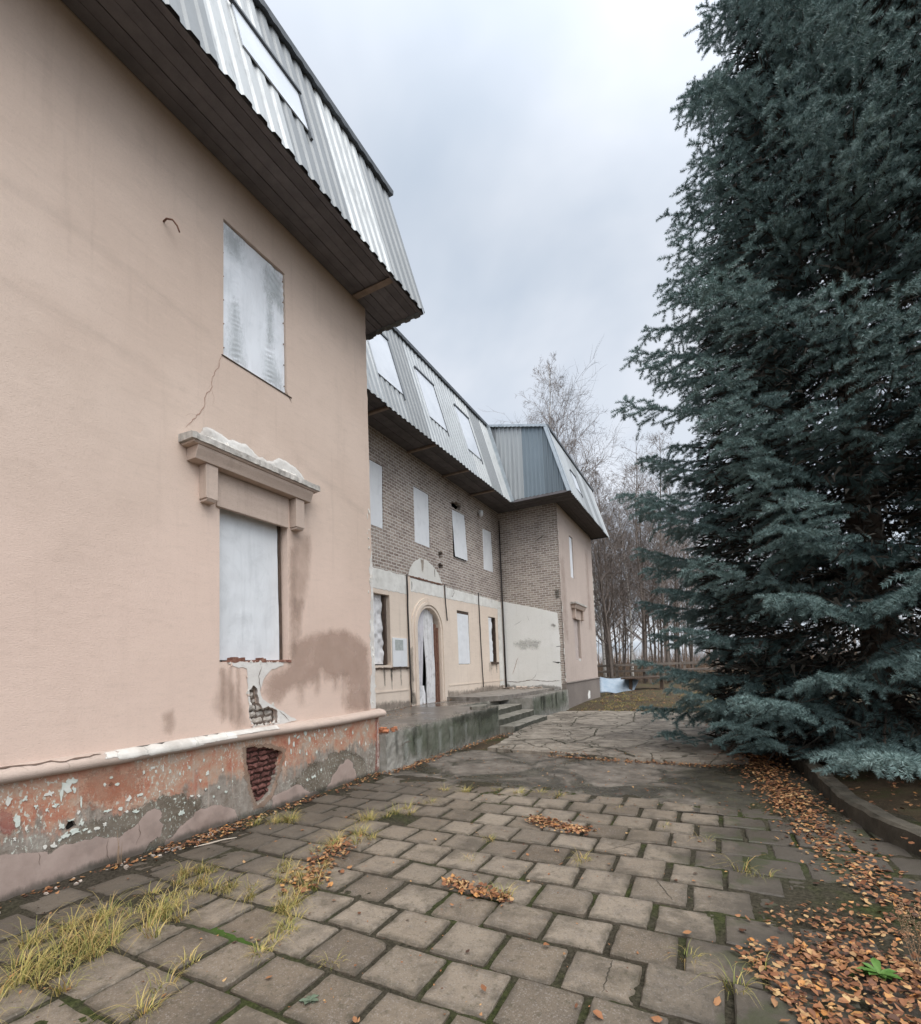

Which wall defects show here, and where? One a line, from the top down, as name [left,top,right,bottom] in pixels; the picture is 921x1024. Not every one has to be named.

crack [186,356,222,427]
water stain [271,633,416,710]
peeling [0,660,368,854]